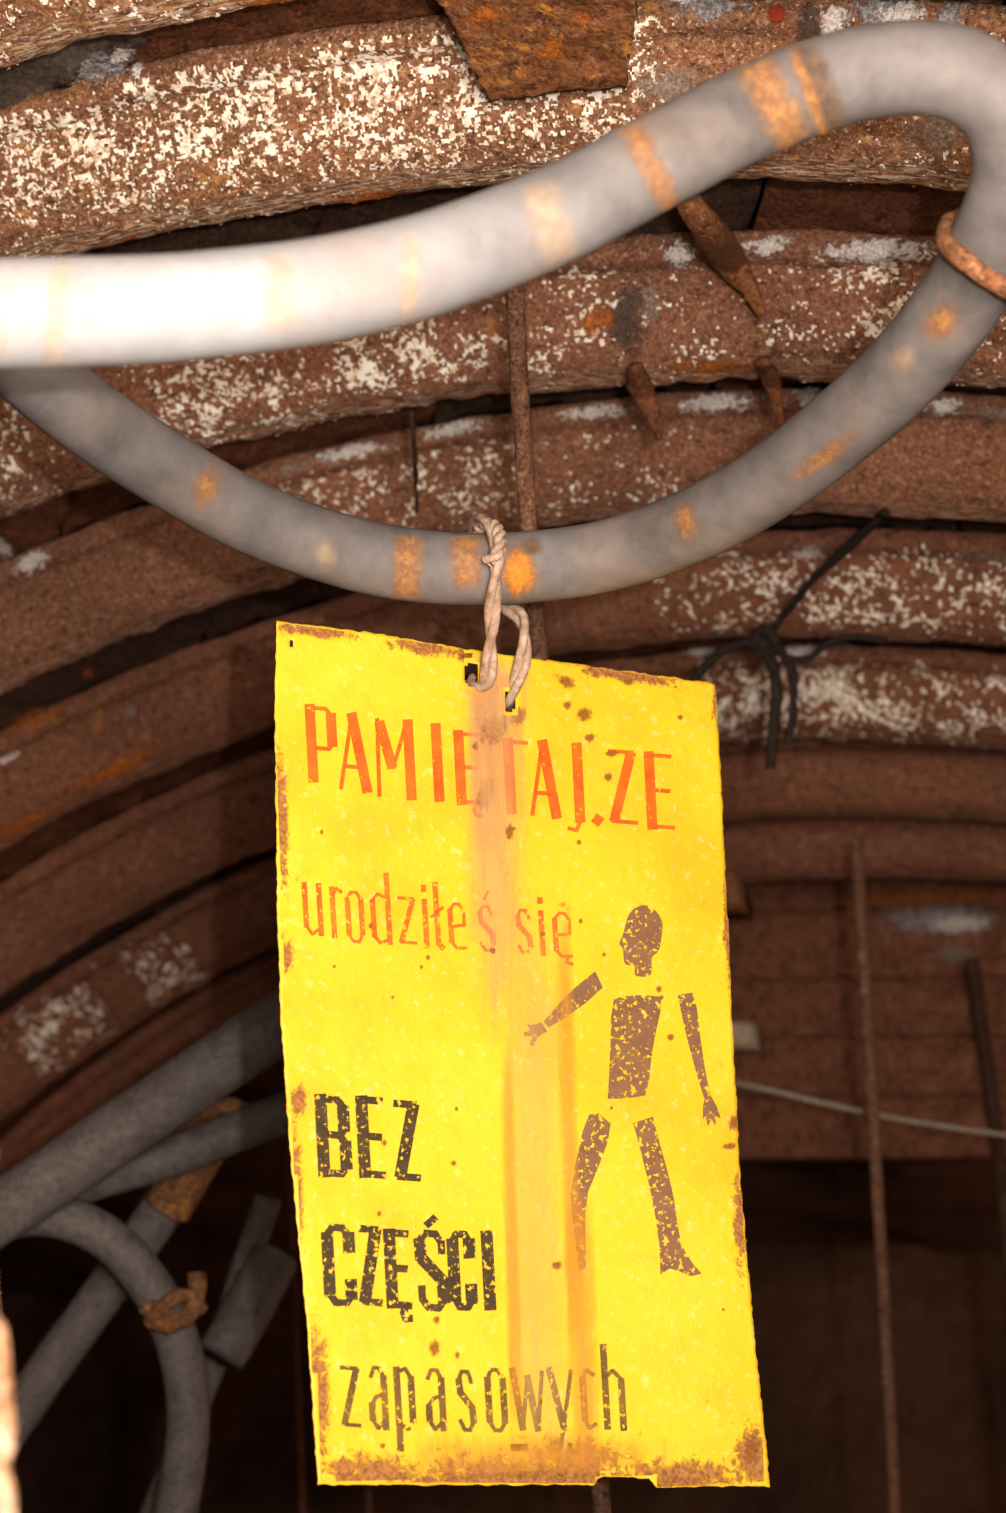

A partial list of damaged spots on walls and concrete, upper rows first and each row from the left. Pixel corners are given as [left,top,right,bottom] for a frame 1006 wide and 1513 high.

rust [469,6,507,25]
efflorescence [53,42,144,96]
rust [794,59,838,134]
rust [331,188,408,203]
water stain [788,543,827,560]
water stain [674,647,728,657]
water stain [776,642,870,667]